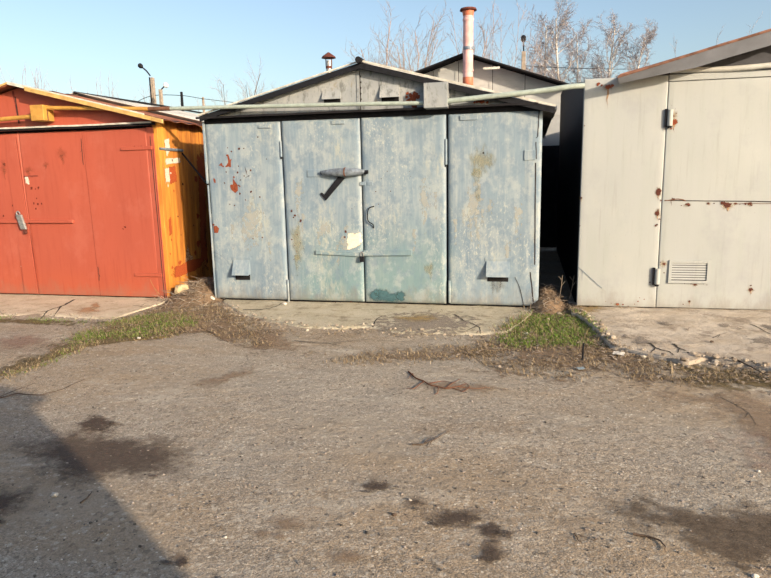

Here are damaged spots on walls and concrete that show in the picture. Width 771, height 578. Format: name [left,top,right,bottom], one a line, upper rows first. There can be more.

corrosion [405,91,420,108]
corrosion [219,154,240,193]
peeling [338,225,362,250]